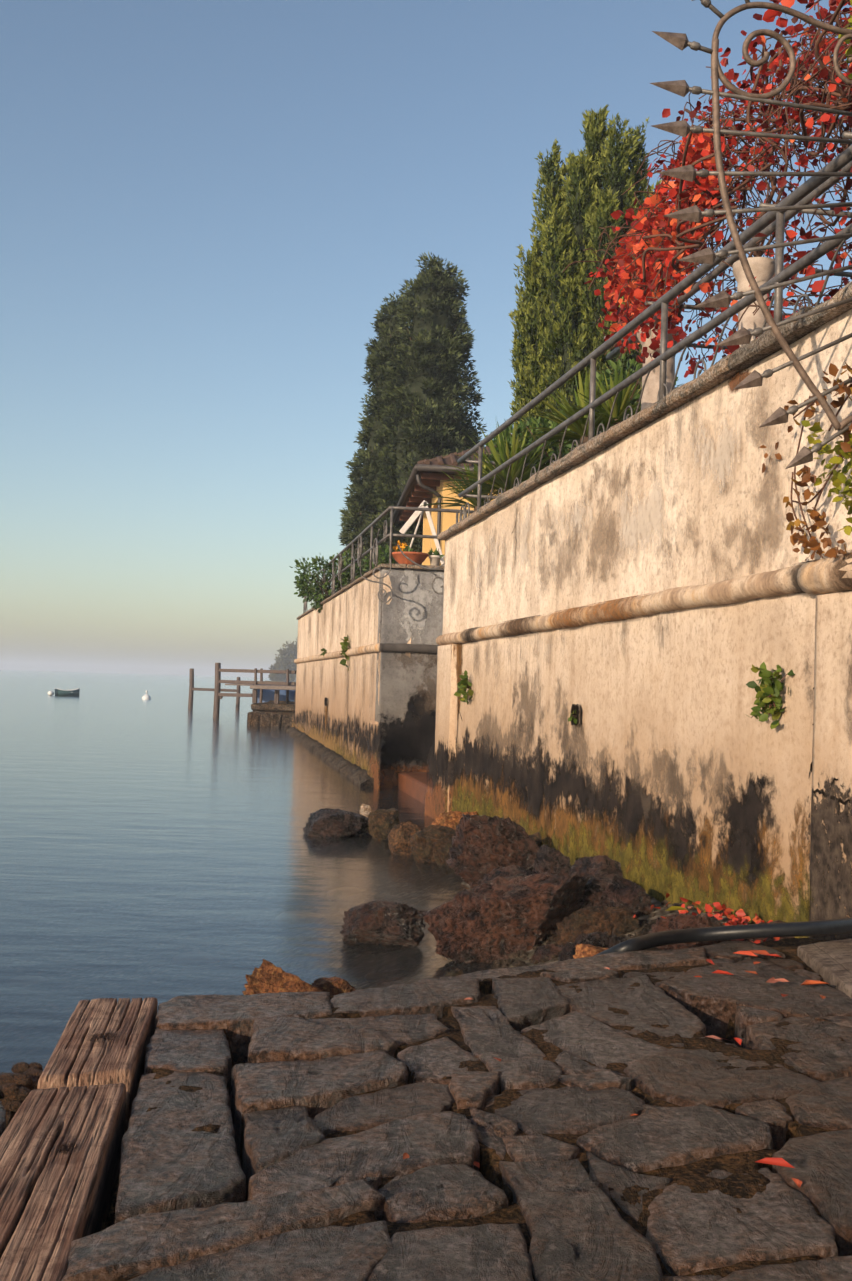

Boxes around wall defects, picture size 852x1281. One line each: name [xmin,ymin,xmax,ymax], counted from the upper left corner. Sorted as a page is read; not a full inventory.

damp [694,399,767,481]
damp [561,464,674,581]
damp [711,459,781,572]
damp [291,711,383,773]
damp [446,728,775,887]
peeling [805,778,852,941]